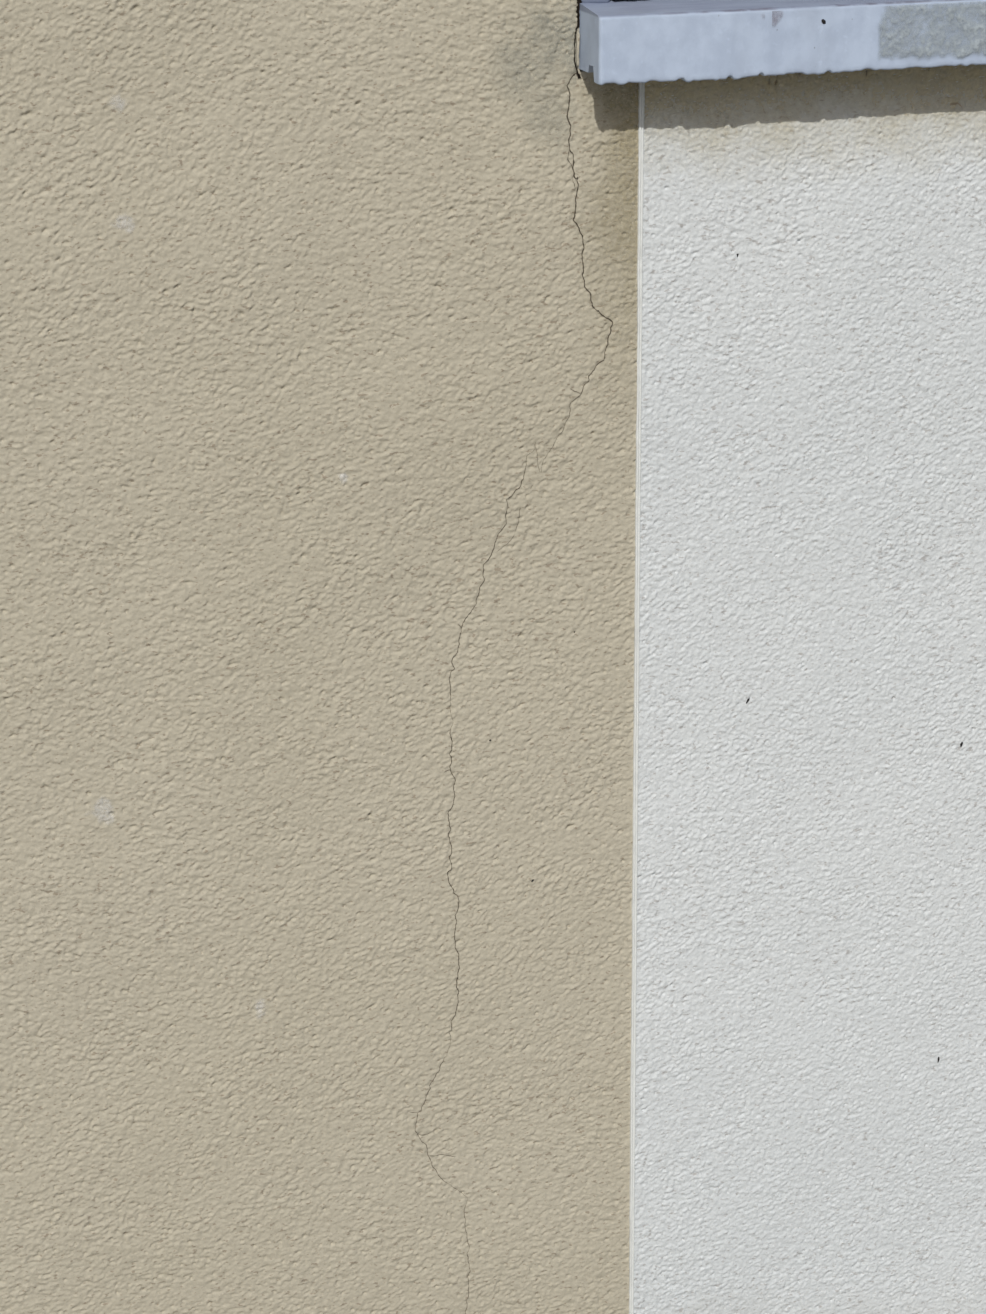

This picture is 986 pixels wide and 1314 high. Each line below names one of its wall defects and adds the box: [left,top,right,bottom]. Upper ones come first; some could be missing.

crack [411,0,613,1314]